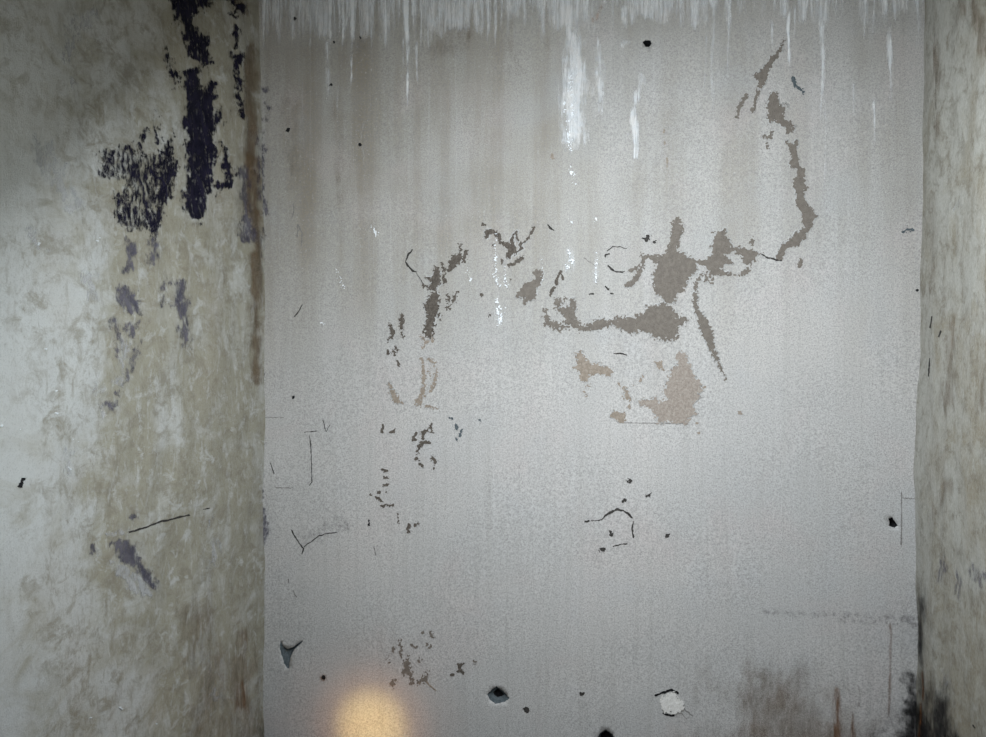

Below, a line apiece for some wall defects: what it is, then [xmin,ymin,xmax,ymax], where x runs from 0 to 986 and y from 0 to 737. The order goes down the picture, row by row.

leakage [262,0,604,151]
leakage [621,0,731,26]
leakage [774,0,837,94]
leakage [630,89,640,158]
leakage [96,0,270,418]
leakage [492,233,509,326]
peeling [481,222,535,280]
peeling [514,37,819,434]
peeling [386,243,469,410]
spalling [487,686,509,704]
spalling [654,689,685,717]
leakage [902,673,948,737]